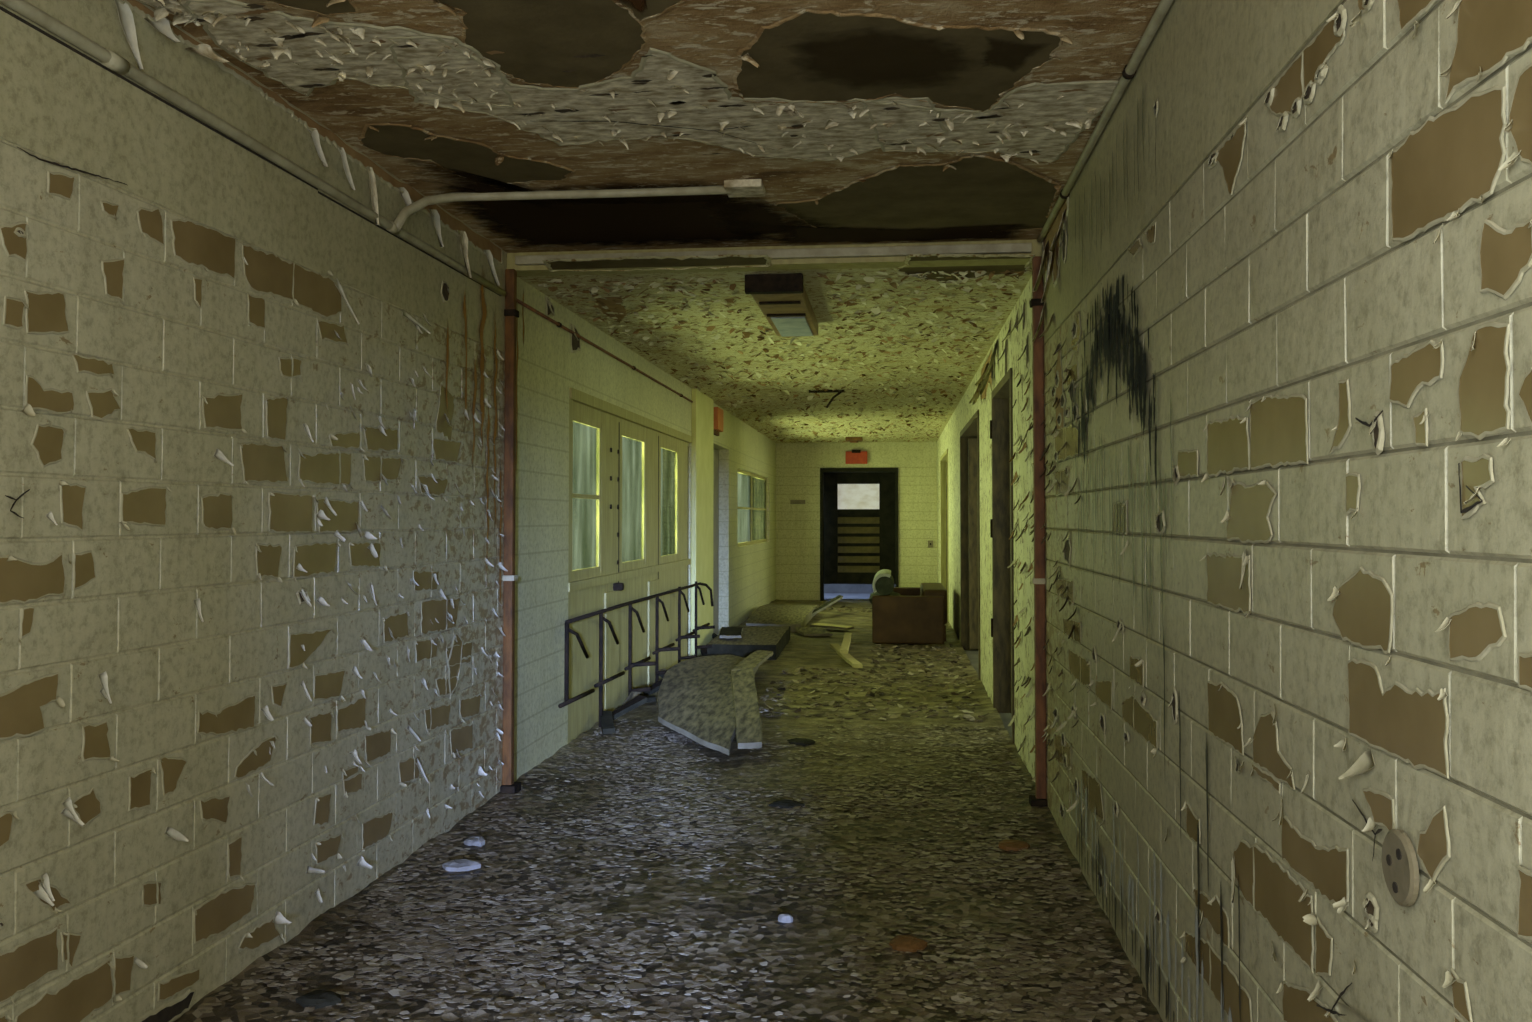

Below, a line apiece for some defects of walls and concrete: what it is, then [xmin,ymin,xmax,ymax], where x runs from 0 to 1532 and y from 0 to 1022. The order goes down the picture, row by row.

peeling [1264,0,1375,132]
peeling [1388,0,1532,300]
peeling [115,0,1178,903]
peeling [1172,394,1308,618]
peeling [1329,321,1532,520]
peeling [0,672,65,740]
peeling [81,671,119,762]
leakage [1071,272,1240,1022]
peeling [1328,566,1449,833]
peeling [1518,652,1532,692]
peeling [194,795,292,954]
peeling [1517,865,1532,942]